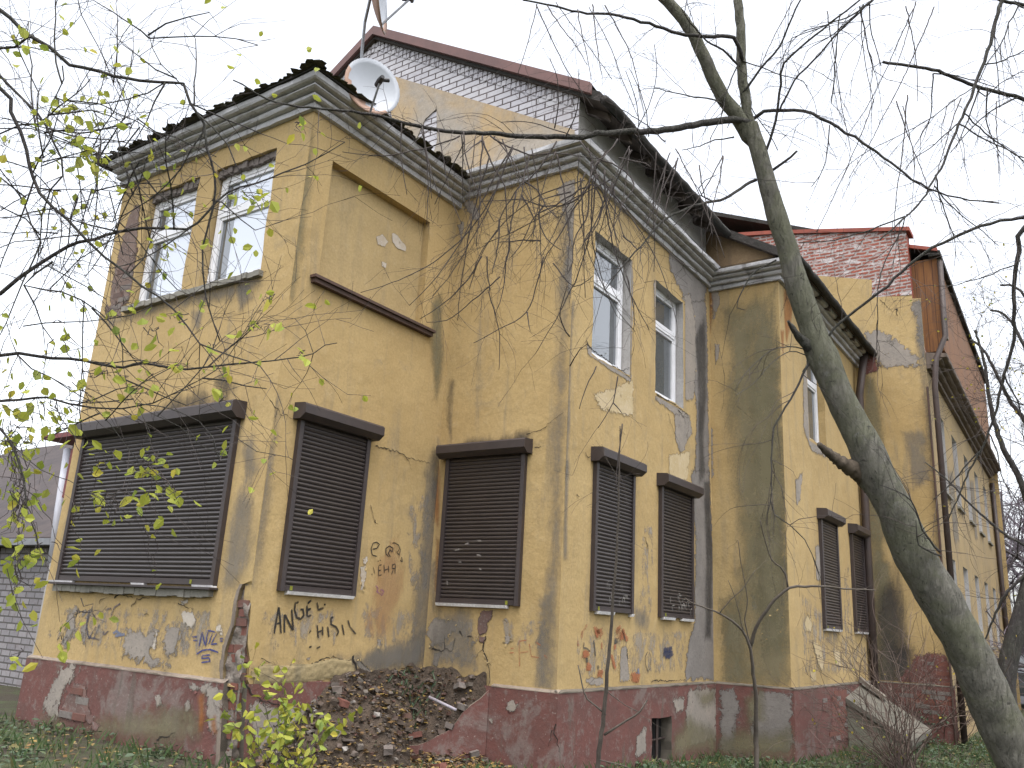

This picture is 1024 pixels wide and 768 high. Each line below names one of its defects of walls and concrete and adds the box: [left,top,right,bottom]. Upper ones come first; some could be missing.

peeling [376,233,406,251]
spalling [42,663,101,731]
spalling [122,584,320,767]
water stain [554,366,570,556]
peeling [587,260,634,416]
peeling [635,726,647,758]
water stain [696,323,712,637]
peeling [655,252,795,753]
water stain [726,301,789,684]
water stain [865,379,881,439]
water stain [869,499,908,681]
peeling [864,300,924,374]